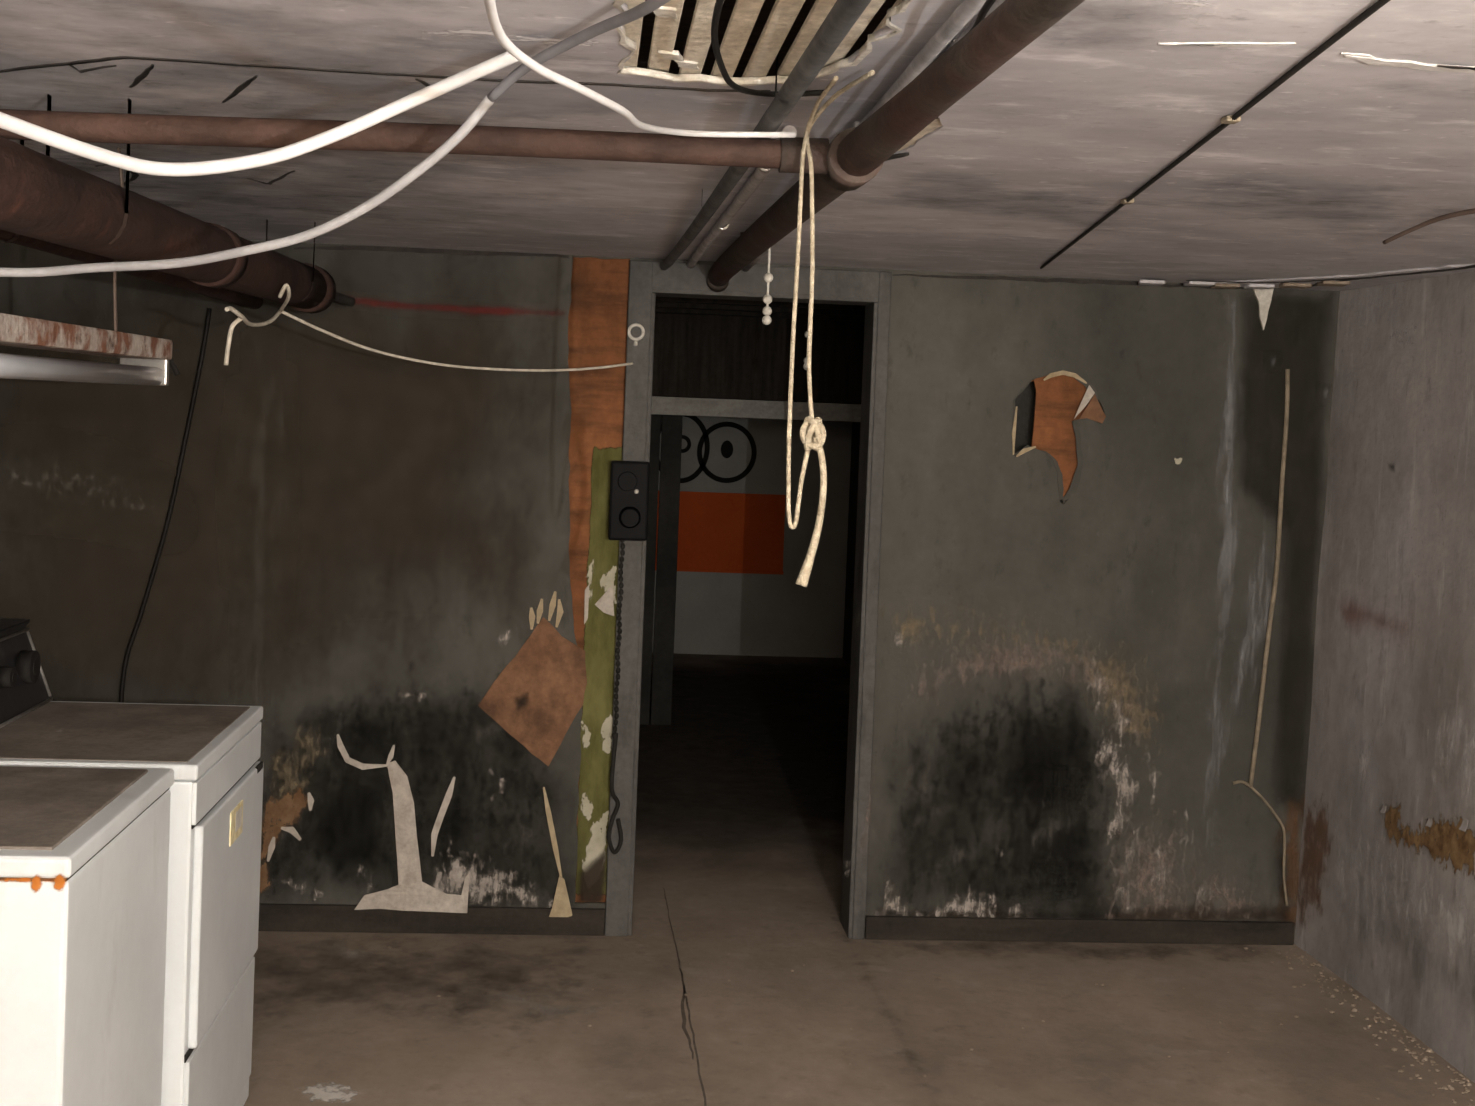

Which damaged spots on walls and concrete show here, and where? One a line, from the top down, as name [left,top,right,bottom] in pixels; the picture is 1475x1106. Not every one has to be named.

peeling [421,26,599,46]
flaking render [613,0,837,86]
flaking render [815,0,912,78]
crack [1158,40,1296,48]
crack [1340,52,1475,73]
flaking render [886,118,942,161]
spalling [1012,370,1107,504]
peeling [478,446,622,917]
leakage [264,694,553,908]
leakage [915,637,1245,917]
peeling [1380,805,1475,878]
crack [664,890,707,1106]